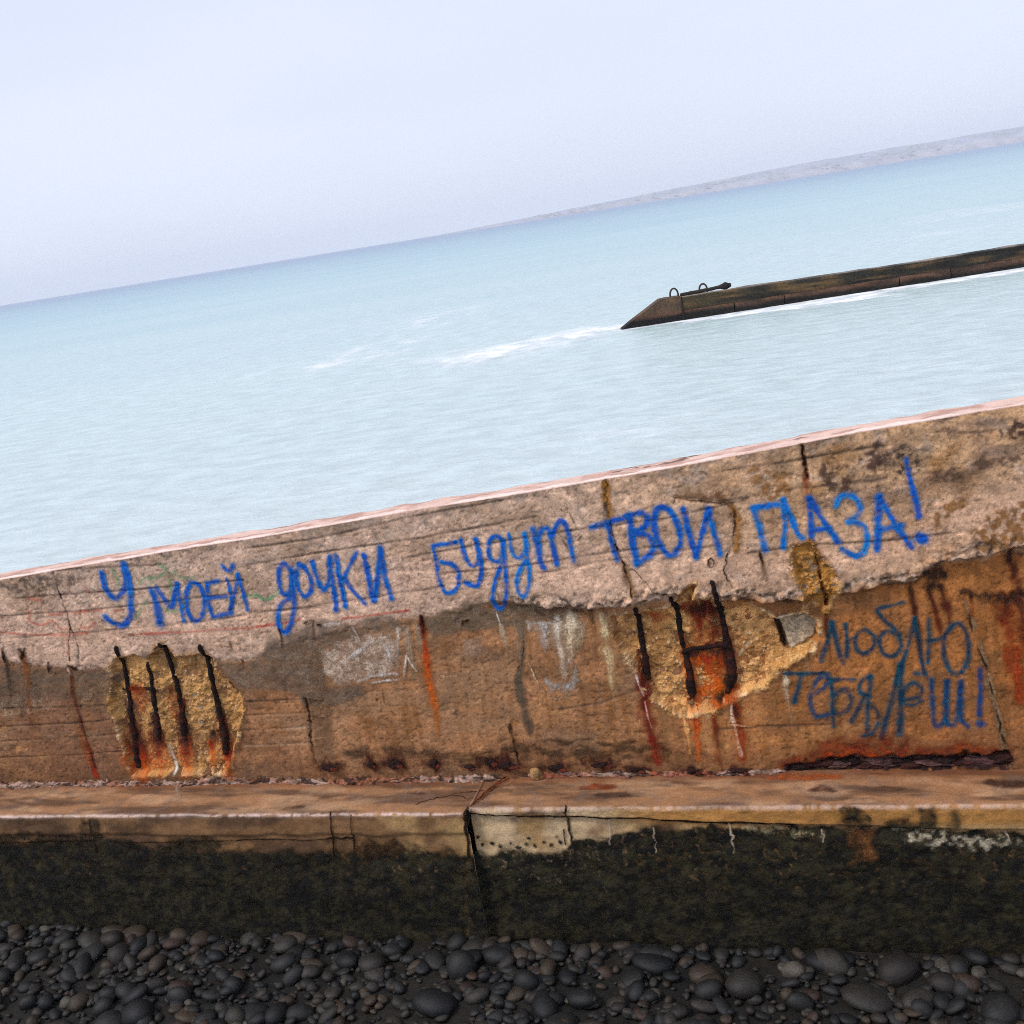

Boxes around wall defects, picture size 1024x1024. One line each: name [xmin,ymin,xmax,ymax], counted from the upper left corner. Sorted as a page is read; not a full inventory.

crack [602,480,654,598]
corrosion [69,670,98,778]
corrosion [123,706,164,774]
spalling [106,642,246,779]
corrosion [168,686,192,766]
damp [225,603,615,732]
corrosion [418,615,438,725]
crack [416,724,795,859]
corrosion [681,600,751,776]
spalling [609,492,842,719]
corrosion [770,734,1024,792]
corrosion [959,549,1024,704]